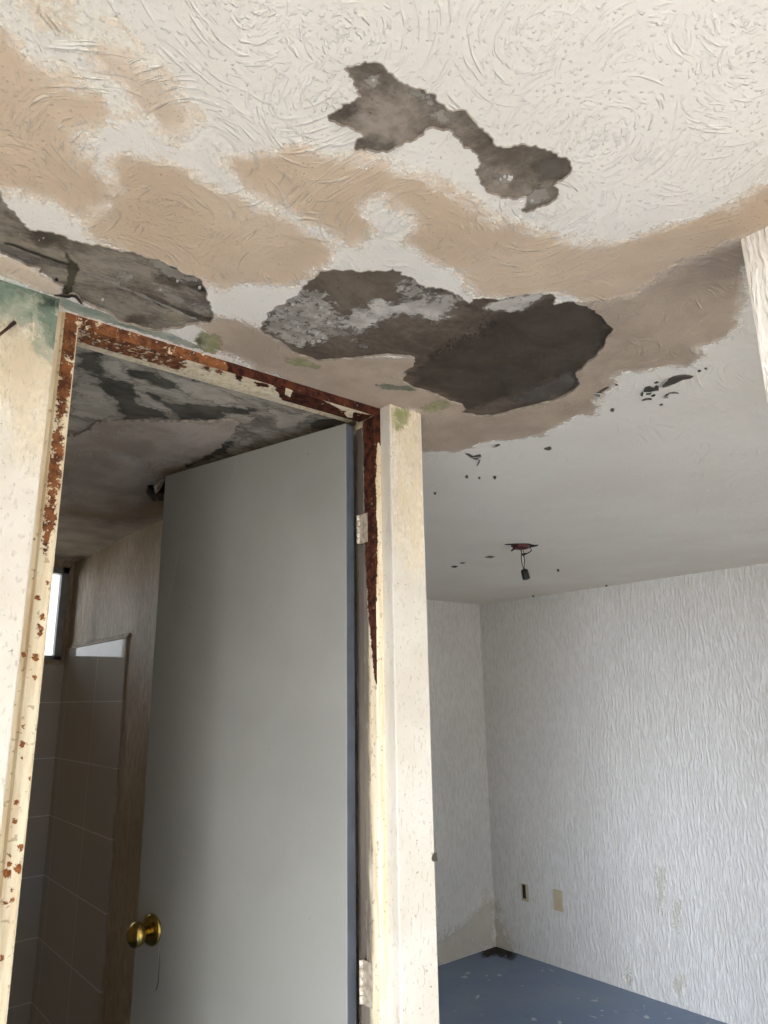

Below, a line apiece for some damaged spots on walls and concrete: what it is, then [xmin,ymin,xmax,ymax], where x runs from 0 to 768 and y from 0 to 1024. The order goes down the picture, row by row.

flaking render [327,61,573,213]
flaking render [0,190,215,331]
flaking render [67,346,356,473]
water stain [0,28,768,559]
flaking render [259,269,614,417]
peeling [641,368,707,406]
corrosion [33,312,381,684]
corrosion [1,844,24,905]